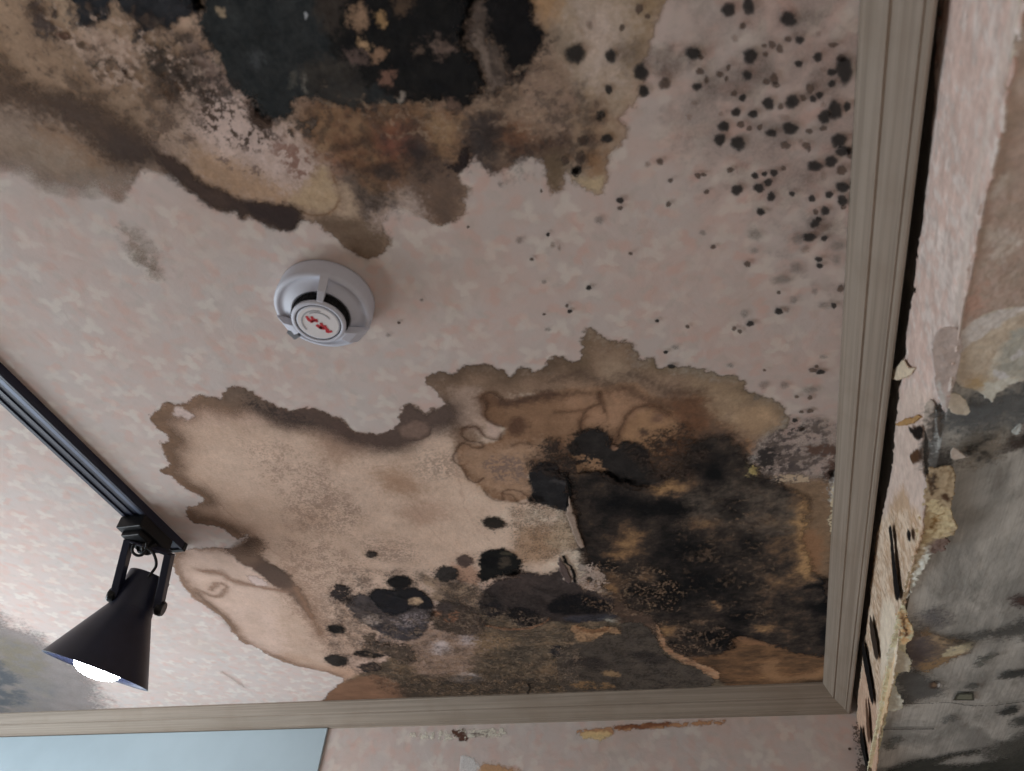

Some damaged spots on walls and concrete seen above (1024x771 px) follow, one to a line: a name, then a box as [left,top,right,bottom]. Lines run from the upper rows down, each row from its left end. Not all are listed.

leakage [0,0,853,269]
peeling [891,360,916,380]
peeling [895,392,970,442]
peeling [950,447,966,460]
leakage [150,327,836,701]
spalling [953,692,974,701]